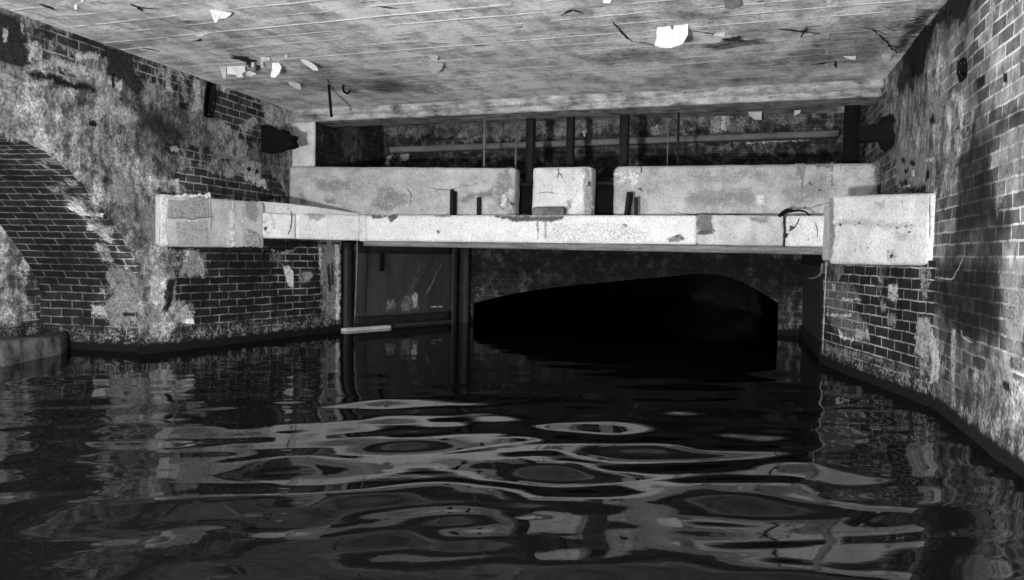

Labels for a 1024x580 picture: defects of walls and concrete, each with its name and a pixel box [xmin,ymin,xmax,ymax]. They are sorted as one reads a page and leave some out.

peeling [195,10,232,36]
crack [613,22,655,47]
peeling [655,24,688,48]
crack [860,17,920,54]
water stain [891,0,970,93]
water stain [0,12,188,152]
water stain [191,79,202,112]
water stain [239,116,258,133]
spalling [203,54,318,118]
water stain [103,172,211,245]
water stain [91,250,207,324]
water stain [914,317,956,384]